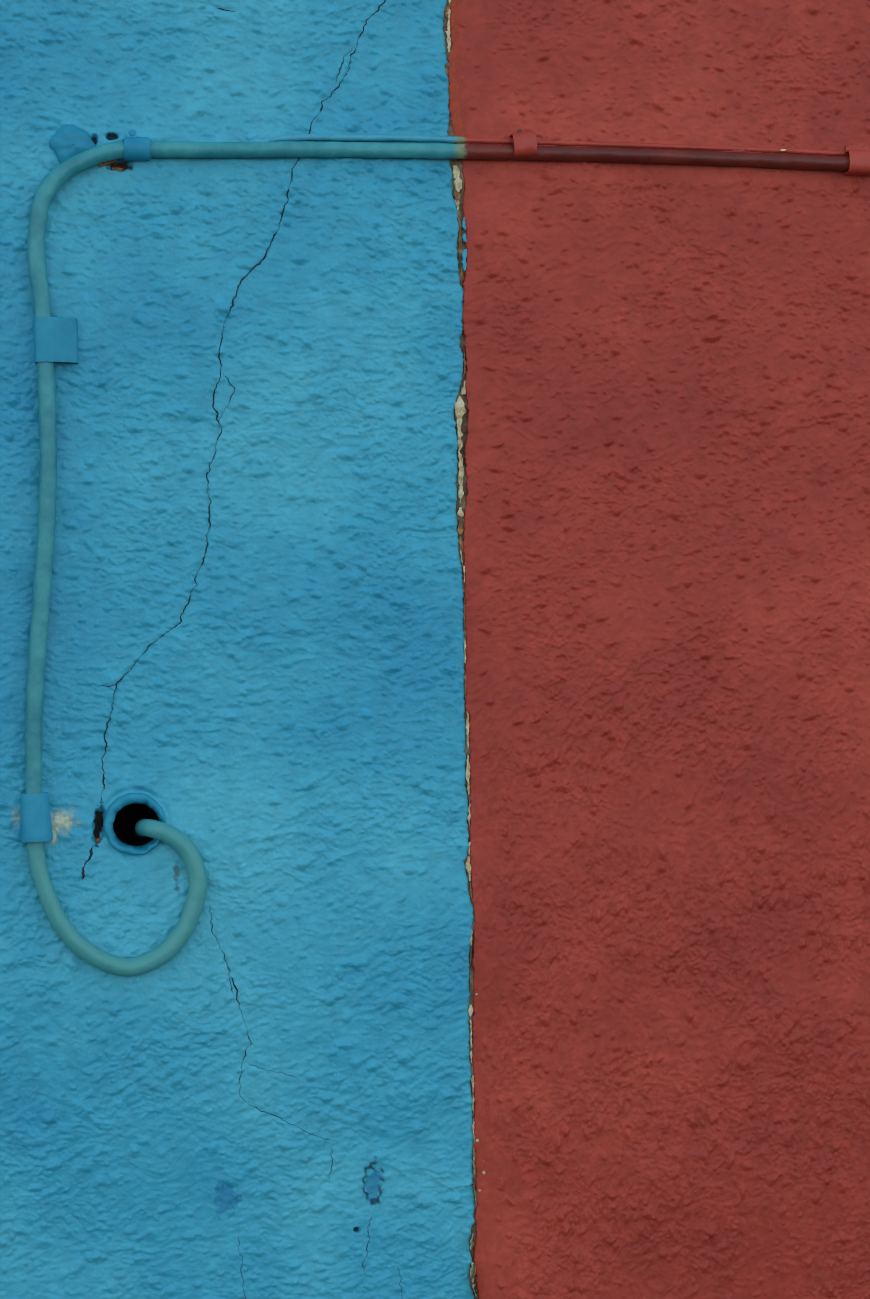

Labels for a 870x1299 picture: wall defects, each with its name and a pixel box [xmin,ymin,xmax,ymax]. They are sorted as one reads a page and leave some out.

peeling [452,165,467,287]
crack [101,0,386,801]
peeling [454,352,471,826]
crack [81,846,93,879]
crack [207,902,334,1182]